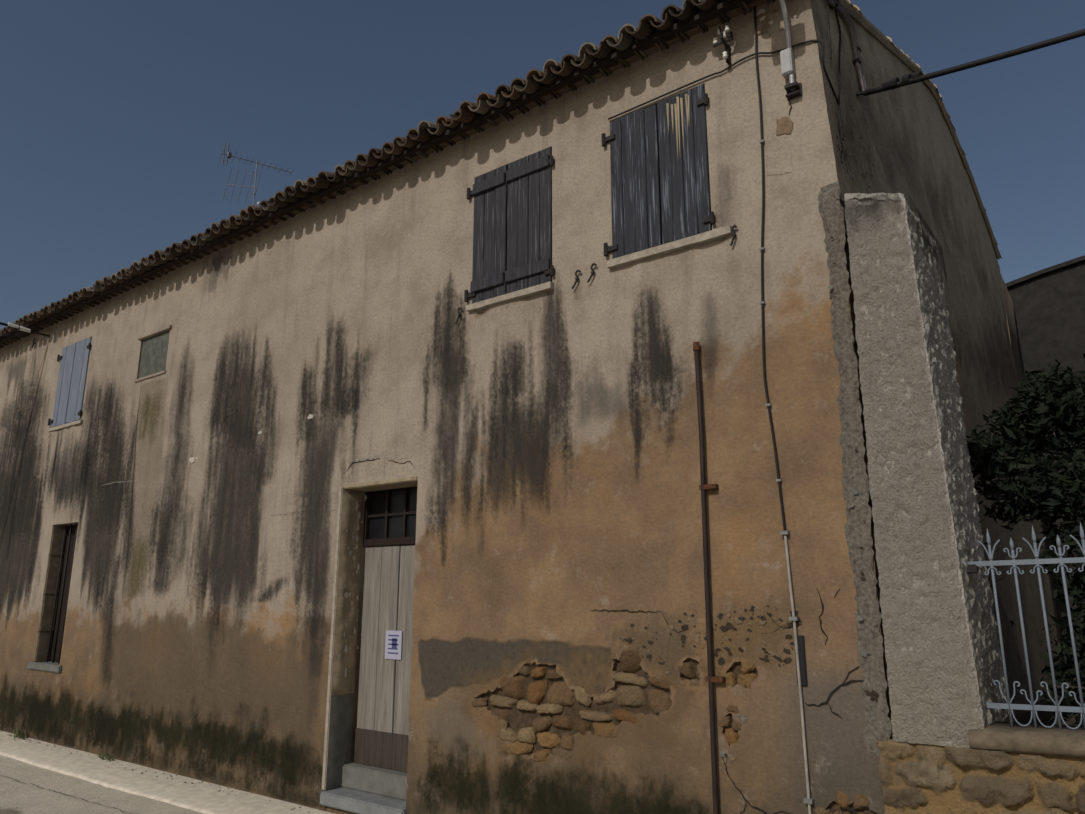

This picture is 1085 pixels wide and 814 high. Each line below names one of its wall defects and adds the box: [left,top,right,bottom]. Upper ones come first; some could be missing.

damp [425,283,569,523]
damp [629,295,681,442]
damp [0,328,369,801]
flaking render [472,605,800,763]
crack [761,588,840,645]
crack [805,666,864,718]
crack [722,757,792,814]